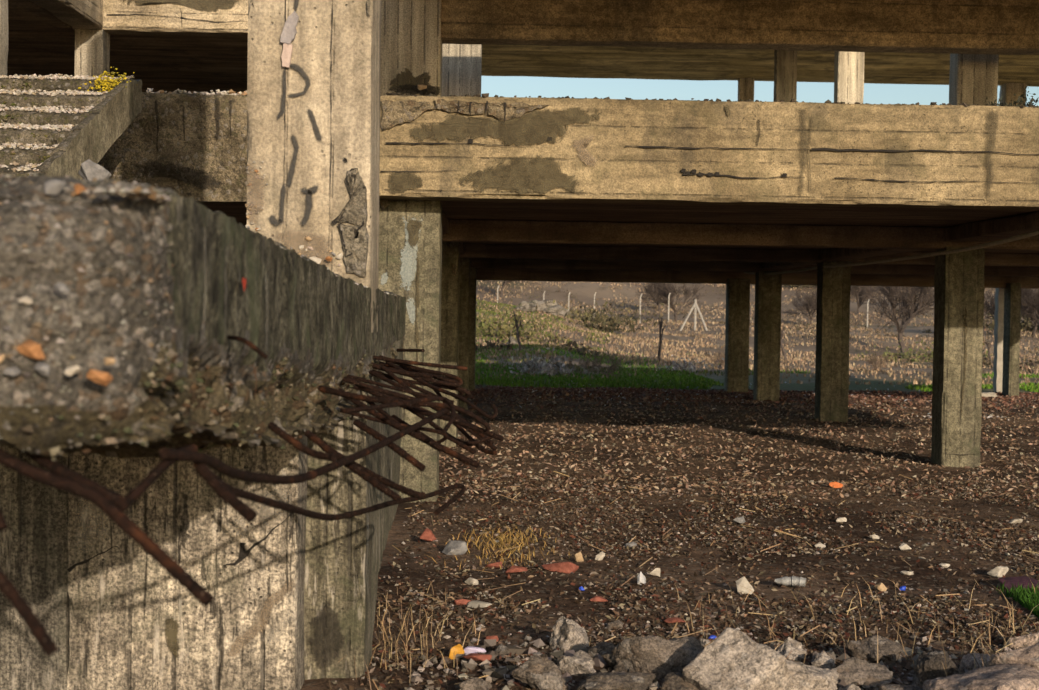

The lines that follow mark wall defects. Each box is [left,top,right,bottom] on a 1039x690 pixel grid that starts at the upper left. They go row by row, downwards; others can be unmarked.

leakage [388,68,440,96]
spalling [245,161,268,231]
spalling [278,158,390,277]
leakage [389,172,423,193]
leakage [411,107,600,195]
crack [223,513,292,566]